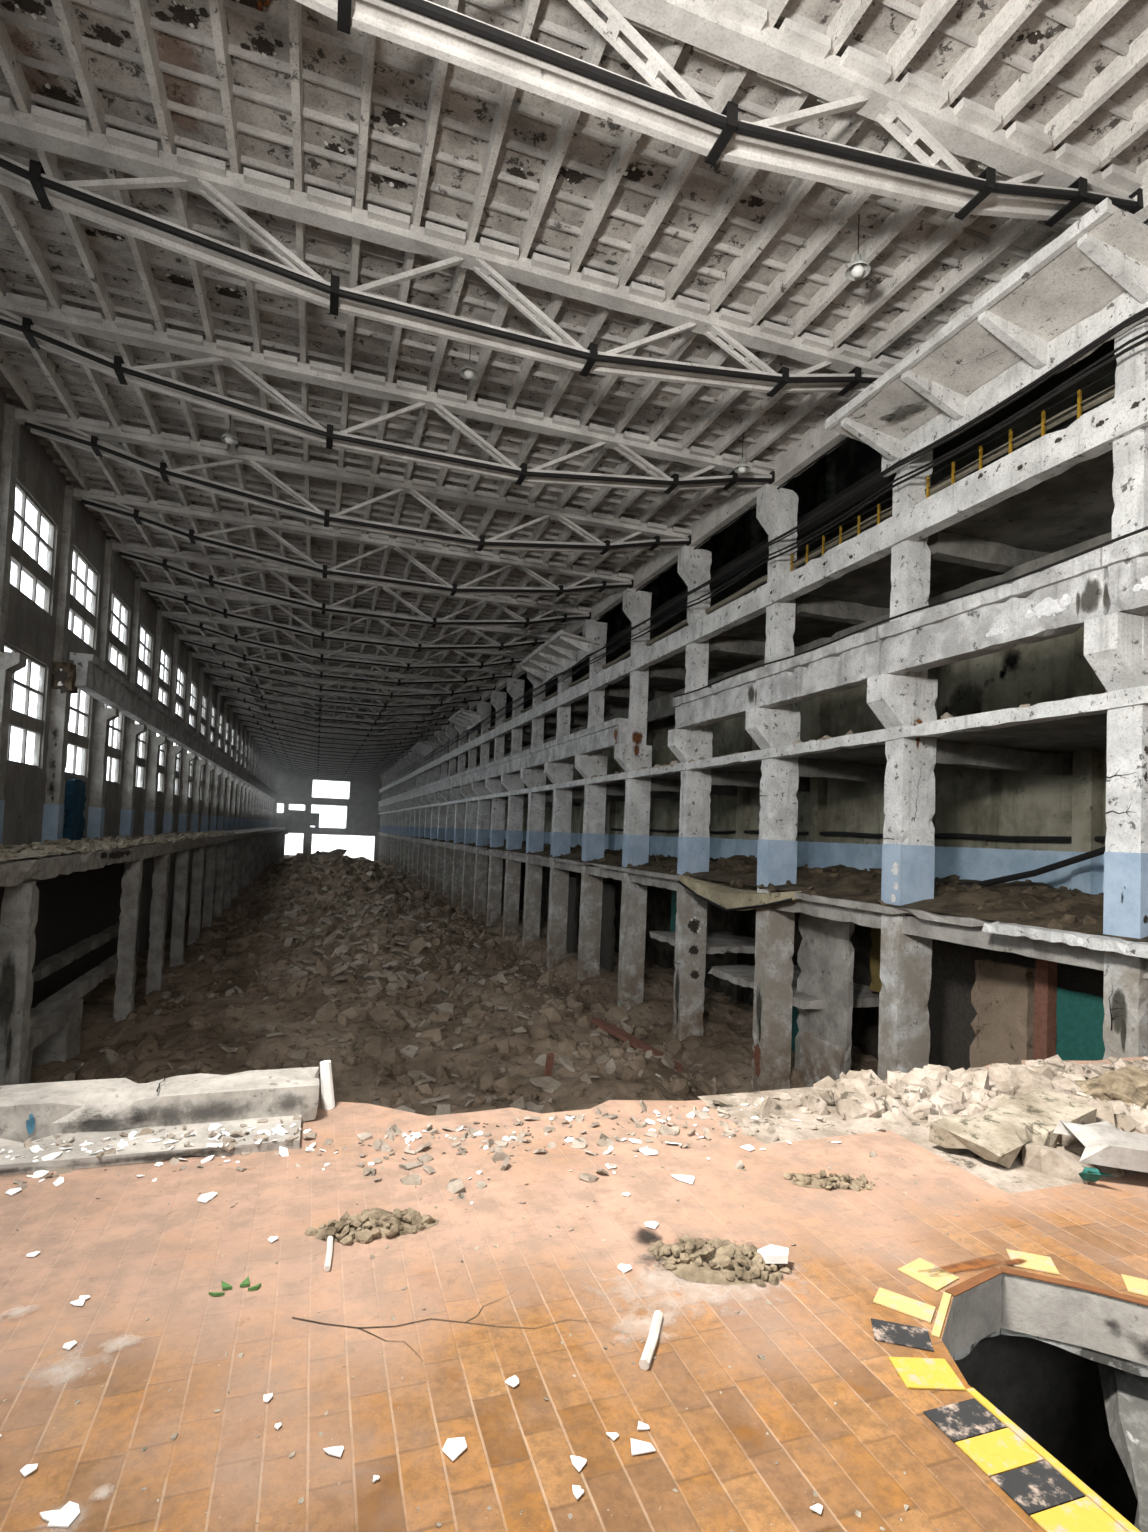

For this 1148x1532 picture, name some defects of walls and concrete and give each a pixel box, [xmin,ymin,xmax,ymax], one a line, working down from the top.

peeling [1,0,53,20]
peeling [154,1,209,29]
peeling [231,0,265,9]
peeling [82,23,131,48]
peeling [240,36,283,58]
peeling [370,108,415,128]
peeling [316,141,355,163]
peeling [370,166,417,190]